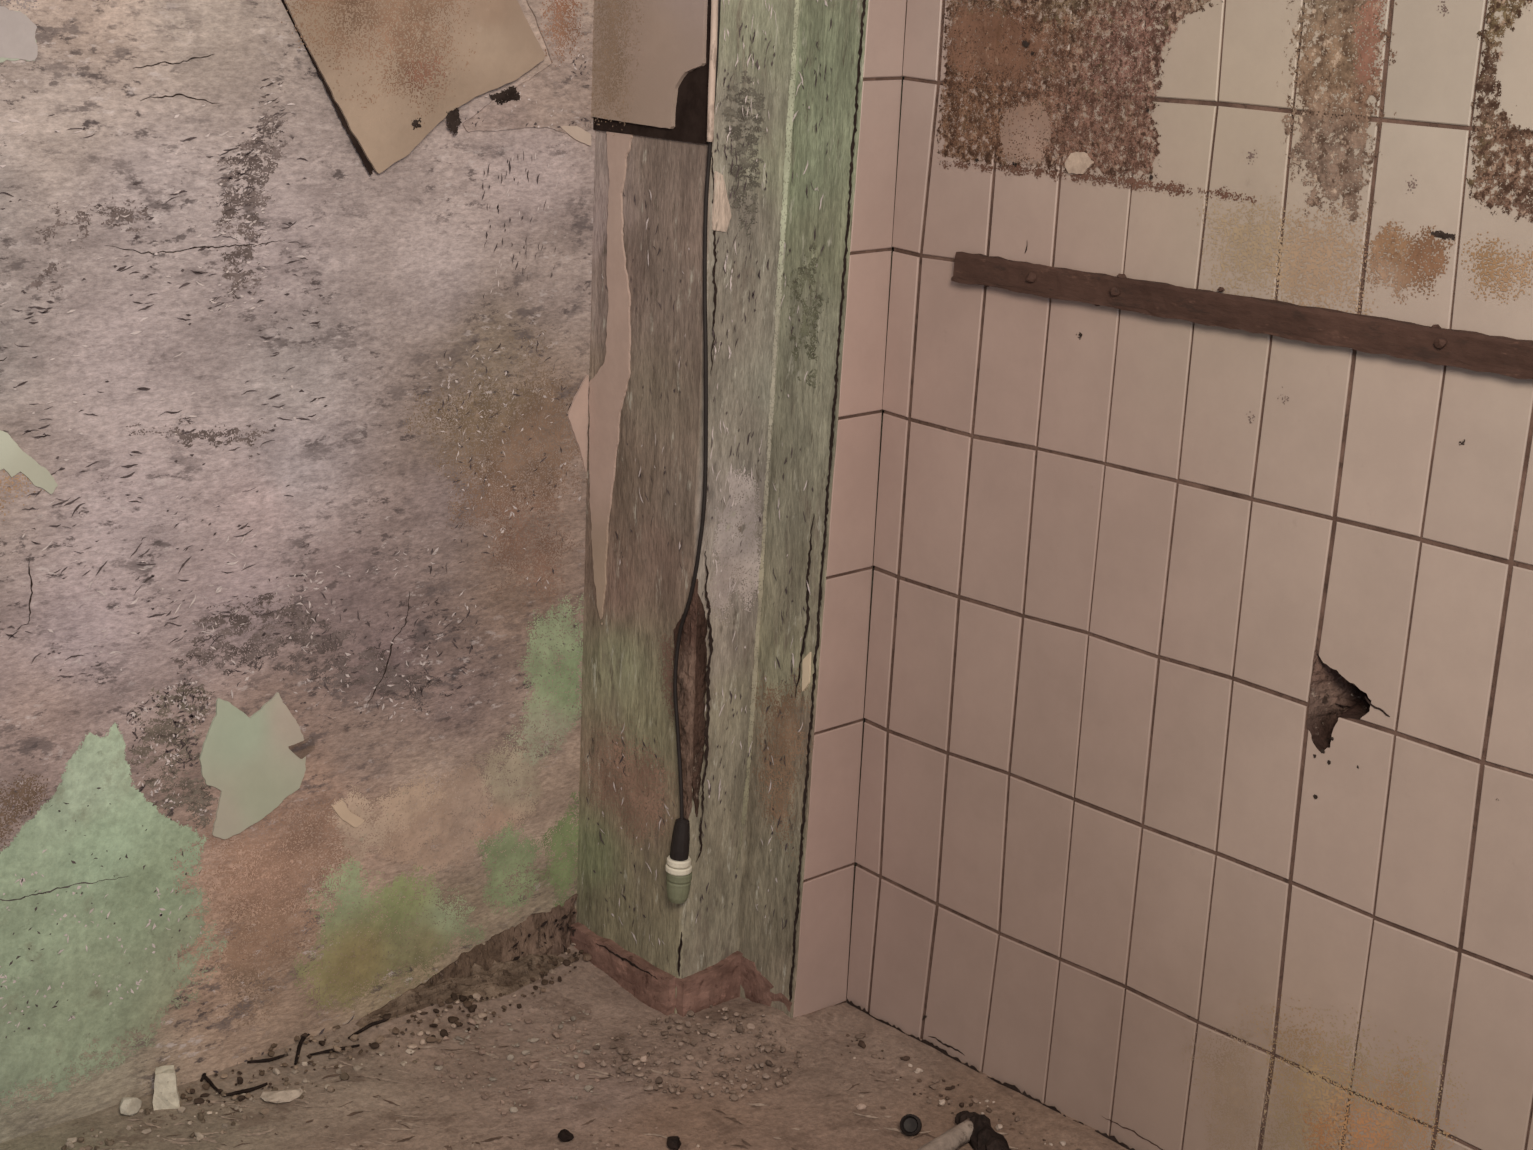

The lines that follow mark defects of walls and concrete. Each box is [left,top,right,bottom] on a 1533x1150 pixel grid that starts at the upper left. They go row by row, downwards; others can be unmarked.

peeling [0,0,39,63]
flaking render [33,193,148,249]
flaking render [30,262,64,295]
peeling [0,430,58,494]
spalling [1307,650,1390,765]
peeling [0,586,454,1114]
crack [695,818,703,862]
crack [0,876,128,901]